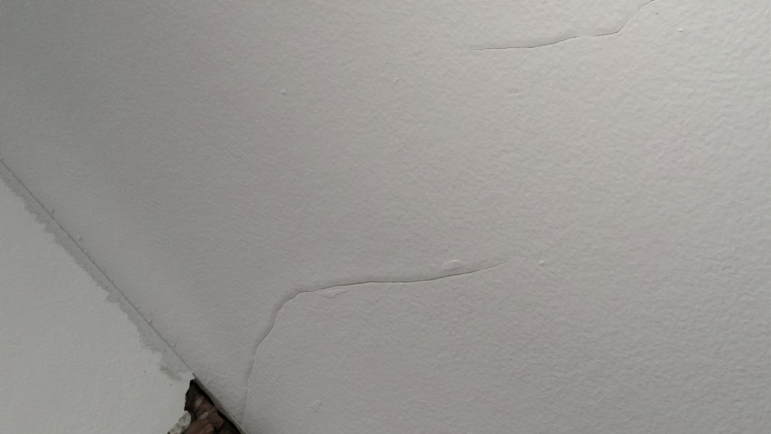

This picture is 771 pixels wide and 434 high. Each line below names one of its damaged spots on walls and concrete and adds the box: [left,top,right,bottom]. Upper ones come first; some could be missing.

crack [0,156,190,373]
flaking render [167,373,246,434]
crack [243,252,529,430]